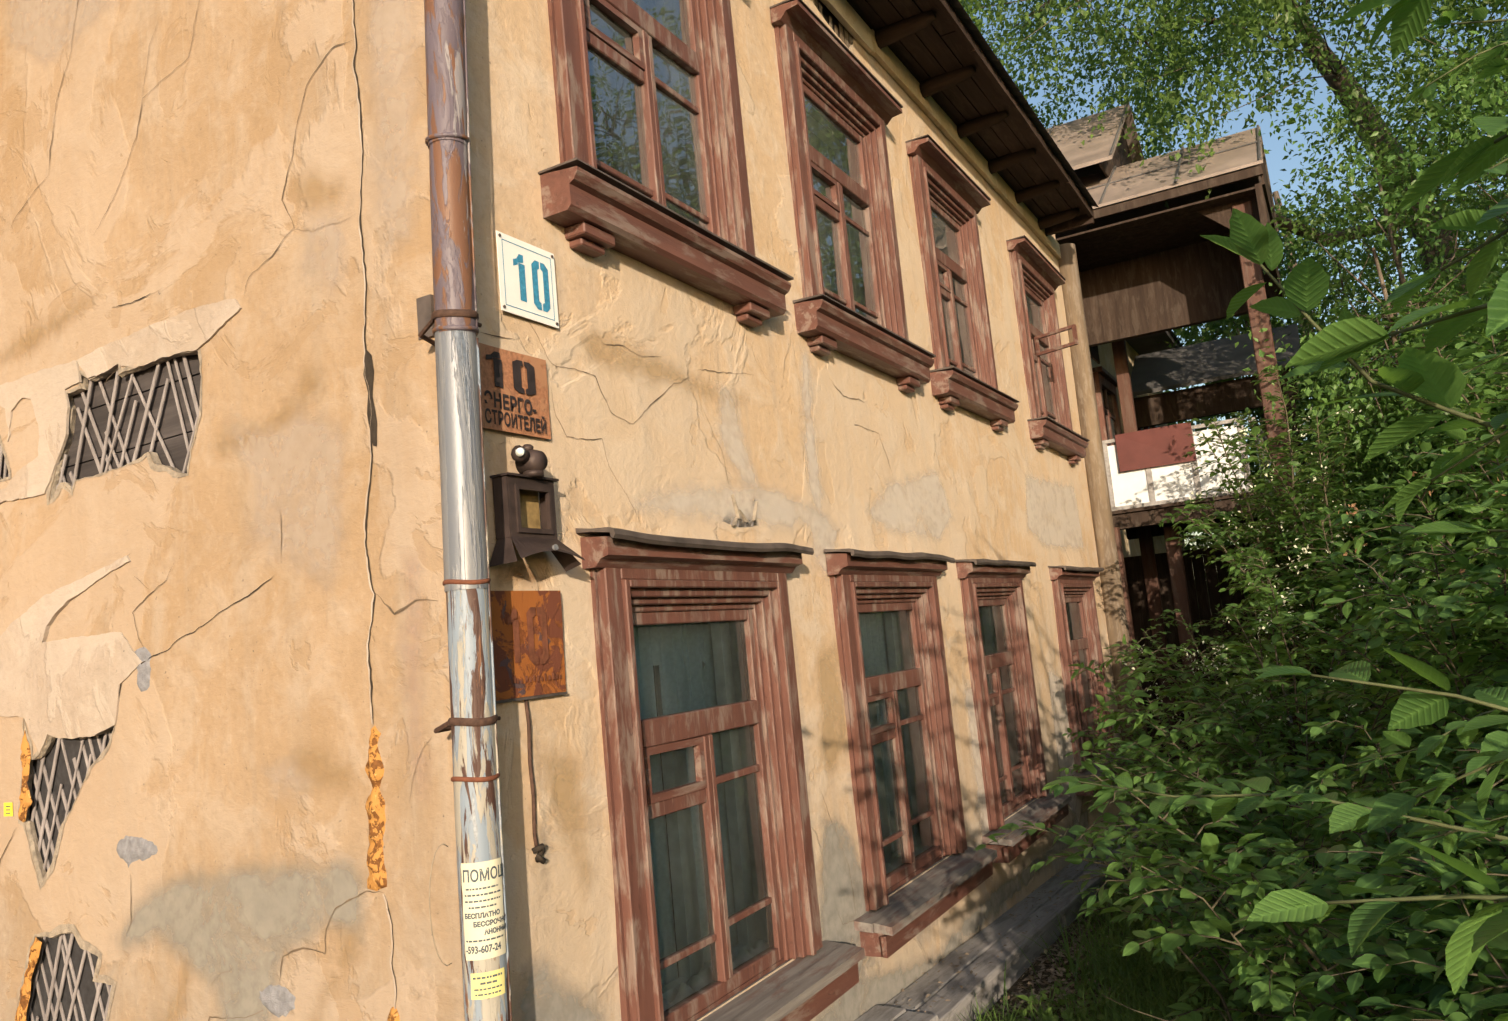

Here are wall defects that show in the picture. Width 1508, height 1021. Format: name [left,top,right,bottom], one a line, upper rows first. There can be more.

flaking render [0,299,242,505]
crack [245,0,437,725]
crack [481,321,752,512]
flaking render [0,555,142,889]
crack [119,567,270,694]
flaking render [16,924,116,1021]
damp [124,867,358,1021]